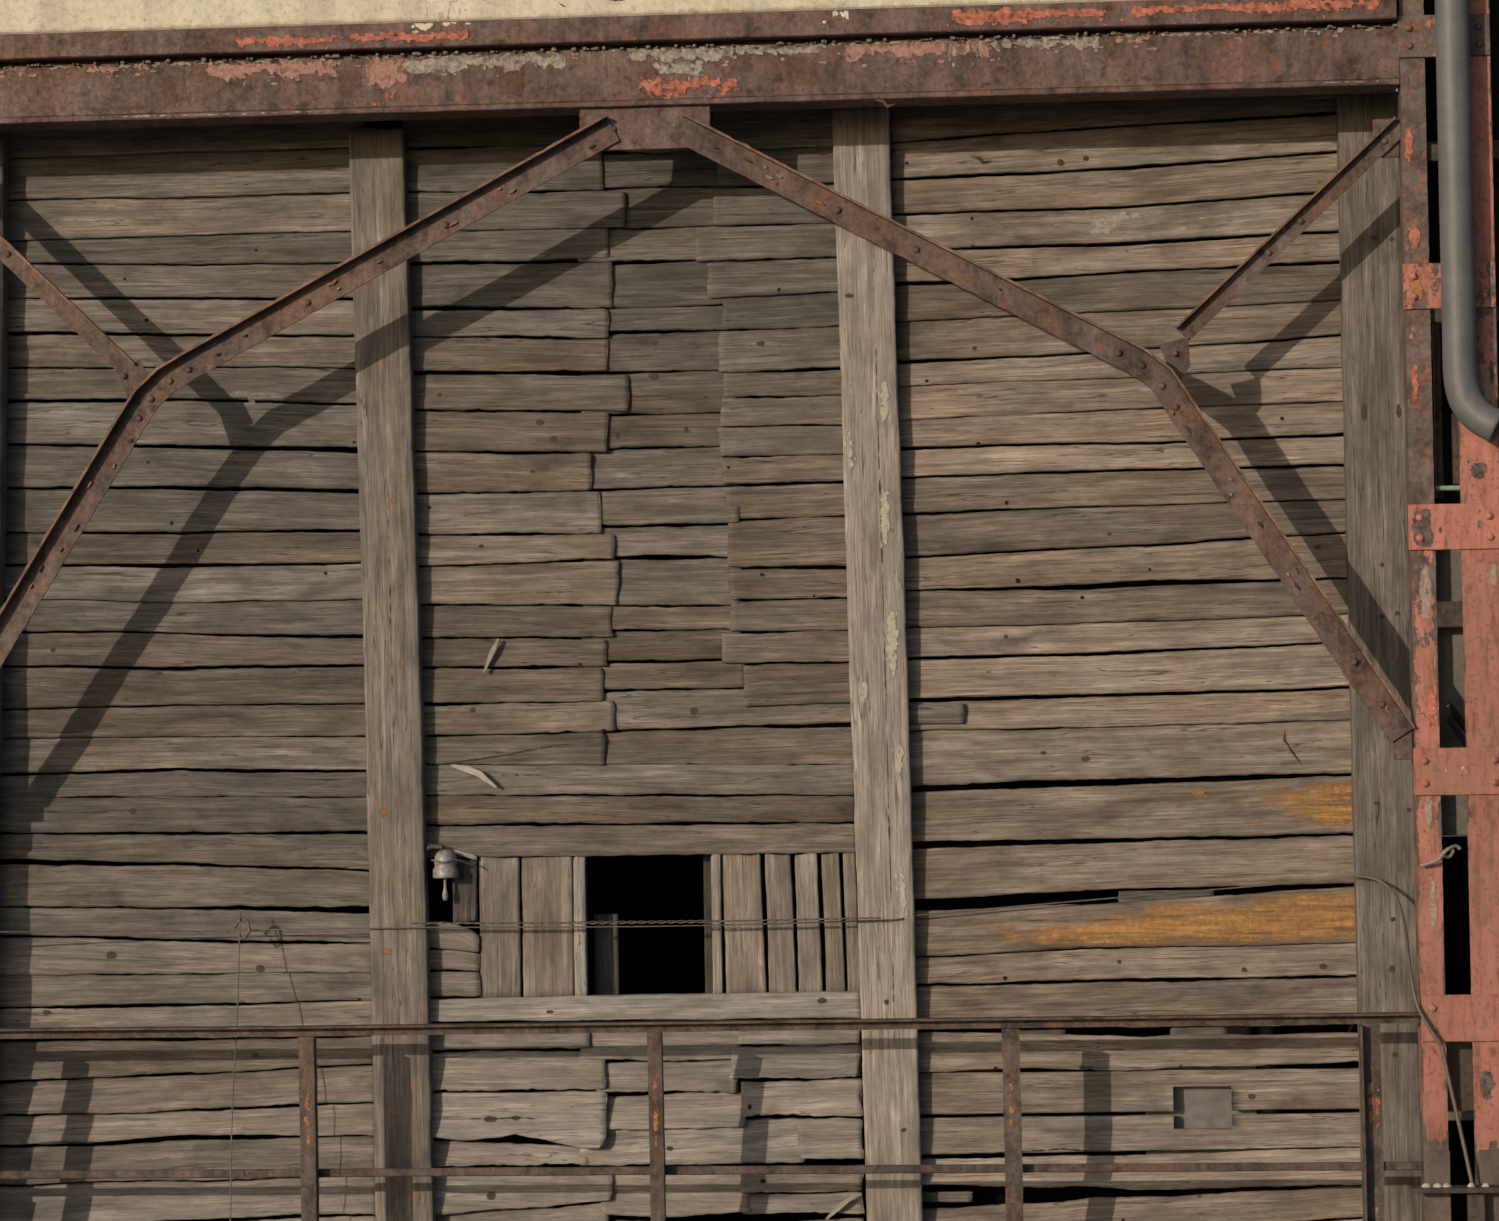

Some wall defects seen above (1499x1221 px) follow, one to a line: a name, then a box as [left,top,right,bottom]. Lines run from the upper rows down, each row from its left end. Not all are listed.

peeling [0,0,1395,106]